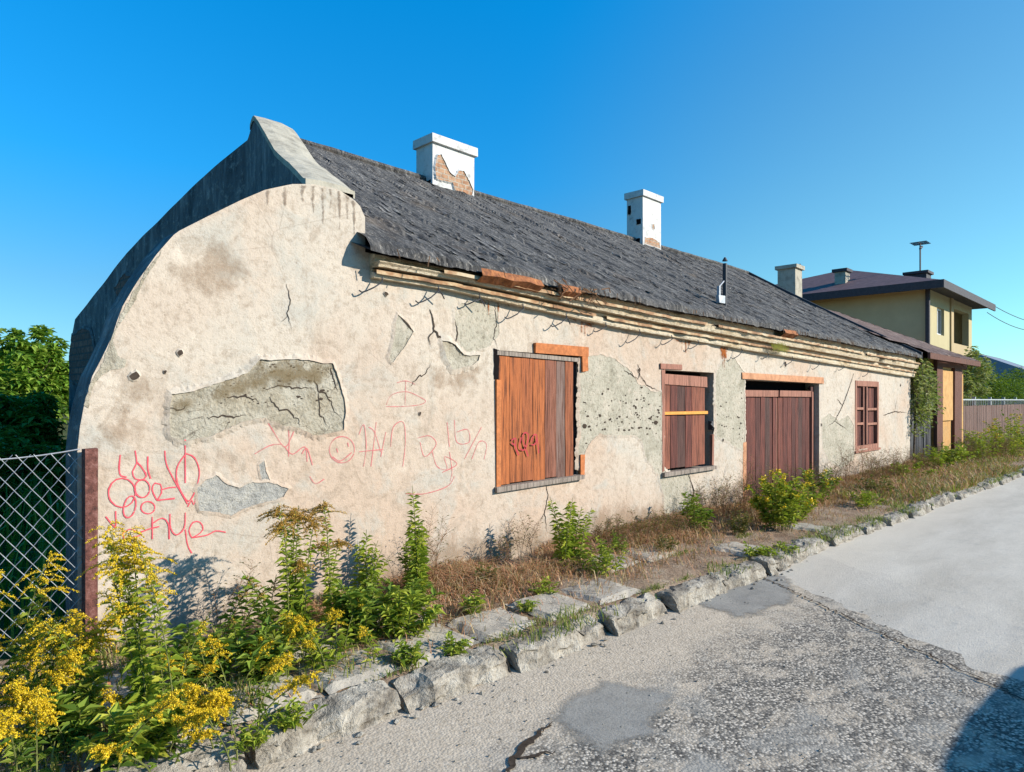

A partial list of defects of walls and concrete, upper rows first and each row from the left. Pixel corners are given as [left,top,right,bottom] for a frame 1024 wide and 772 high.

spalling [385,312,416,366]
crack [411,310,460,386]
flaking render [437,297,502,380]
spalling [161,353,350,448]
spalling [574,351,693,516]
spalling [713,354,747,453]
spalling [192,459,293,519]